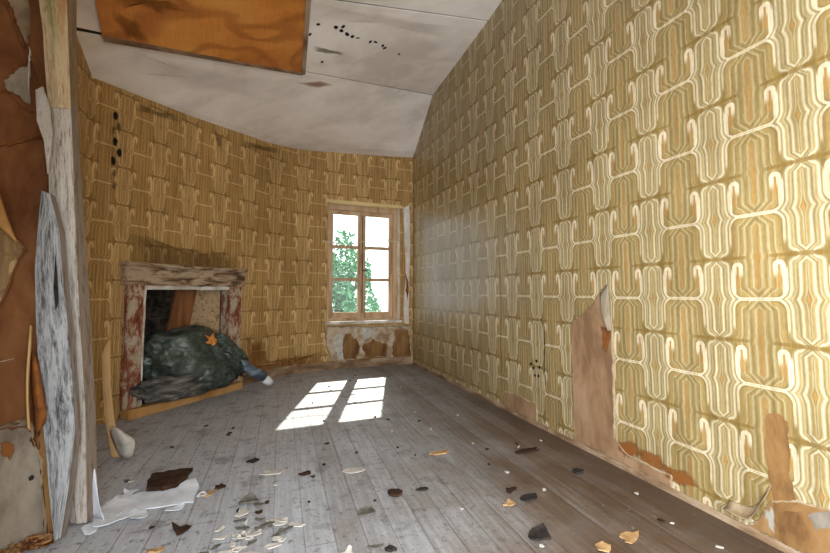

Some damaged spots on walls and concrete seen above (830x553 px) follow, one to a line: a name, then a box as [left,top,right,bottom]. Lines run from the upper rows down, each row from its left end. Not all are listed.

peeling [35,86,53,174]
flaking render [324,205,413,361]
peeling [571,283,673,488]
flaking render [0,418,53,550]
peeling [722,412,830,553]